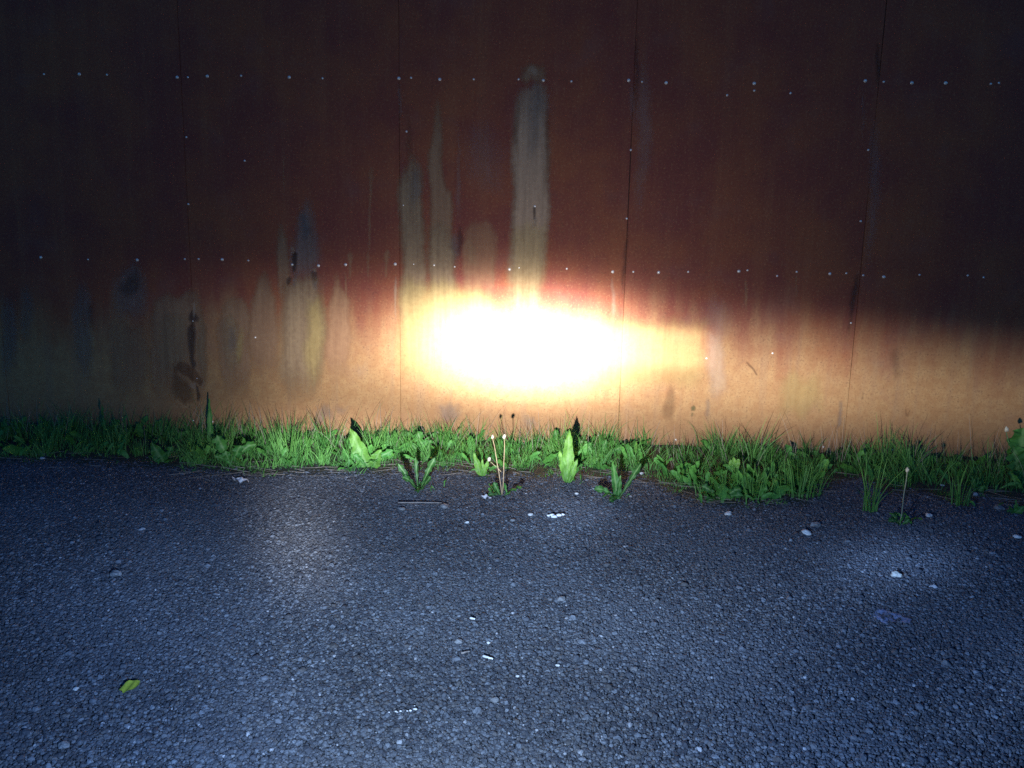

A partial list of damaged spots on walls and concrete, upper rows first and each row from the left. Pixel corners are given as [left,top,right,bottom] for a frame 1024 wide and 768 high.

corrosion [152,295,206,382]
corrosion [250,219,349,383]
corrosion [399,117,455,334]
corrosion [510,67,550,287]